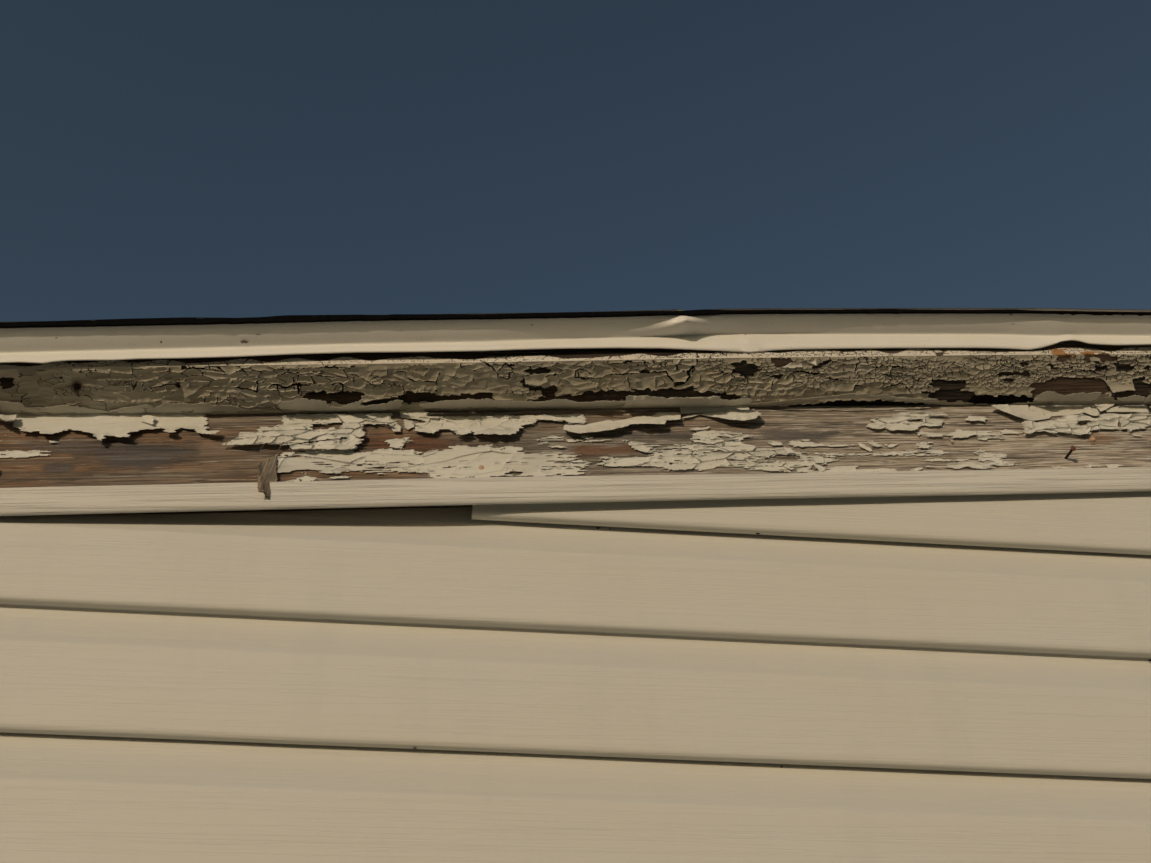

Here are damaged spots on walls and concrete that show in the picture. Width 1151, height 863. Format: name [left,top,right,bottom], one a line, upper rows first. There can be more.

crack [131,362,440,405]
crack [480,360,511,379]
crack [547,360,694,387]
crack [729,357,927,393]
crack [974,357,1099,374]
peeling [0,347,1151,482]